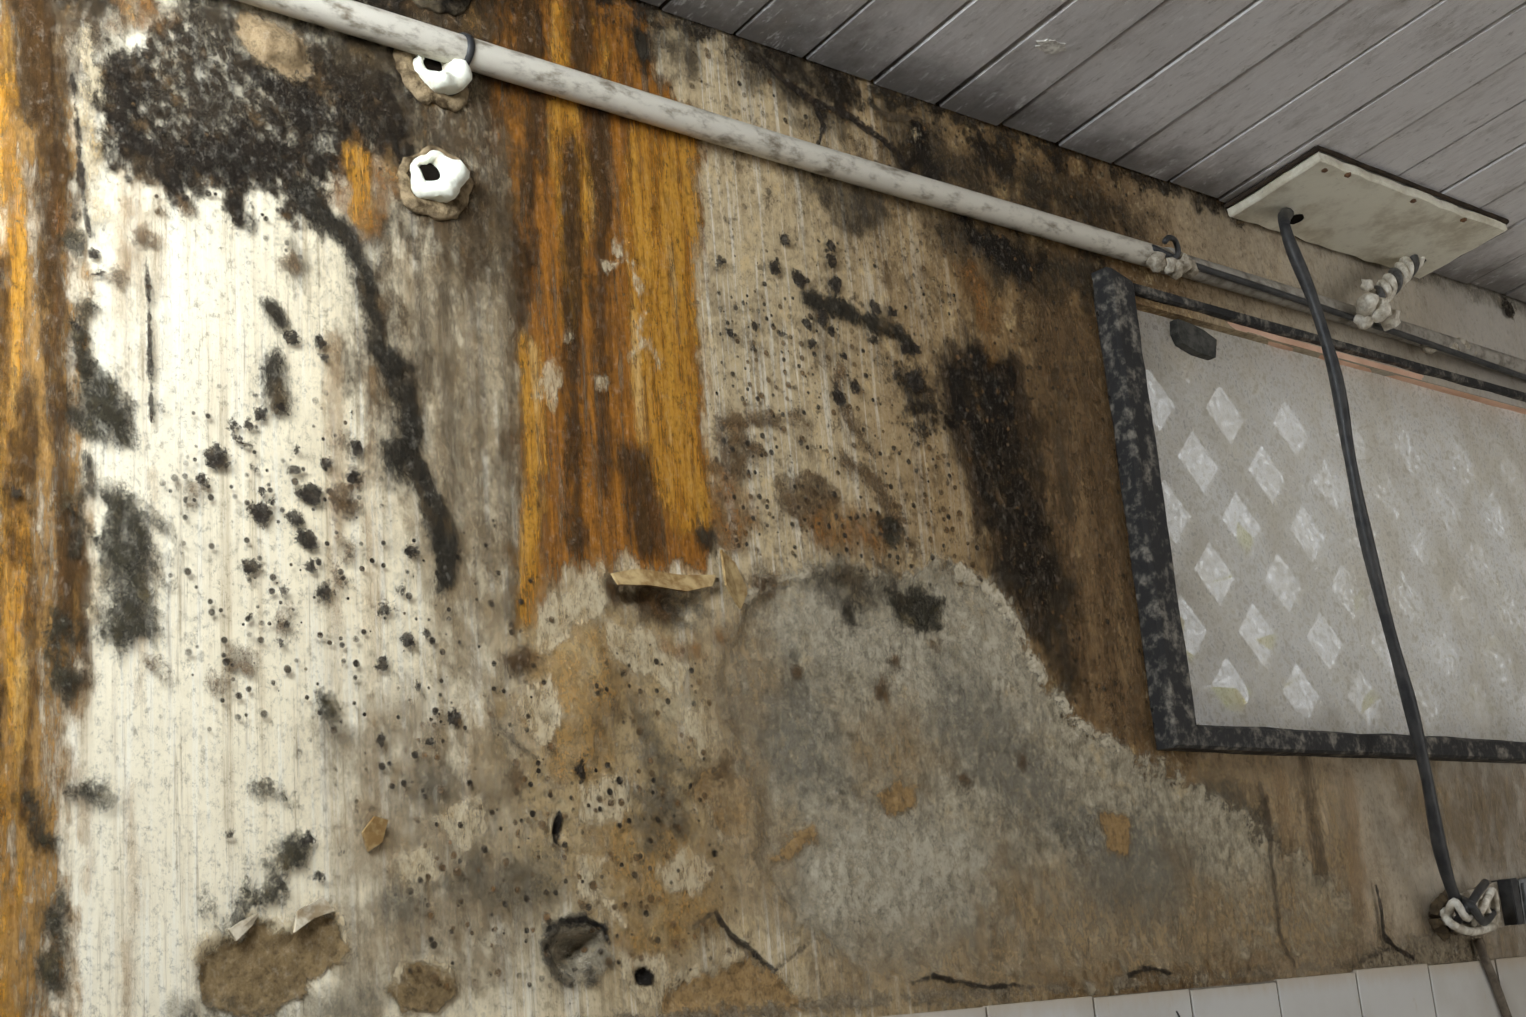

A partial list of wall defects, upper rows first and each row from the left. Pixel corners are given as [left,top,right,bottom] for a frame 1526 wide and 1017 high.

rust [479,0,677,101]
rust [0,0,92,1017]
peeling [192,897,351,1017]
water stain [1,0,733,1000]
peeling [360,808,388,852]
rust [482,77,759,630]
rust [807,503,888,556]
spalling [386,518,1362,1017]
water stain [708,173,1154,738]